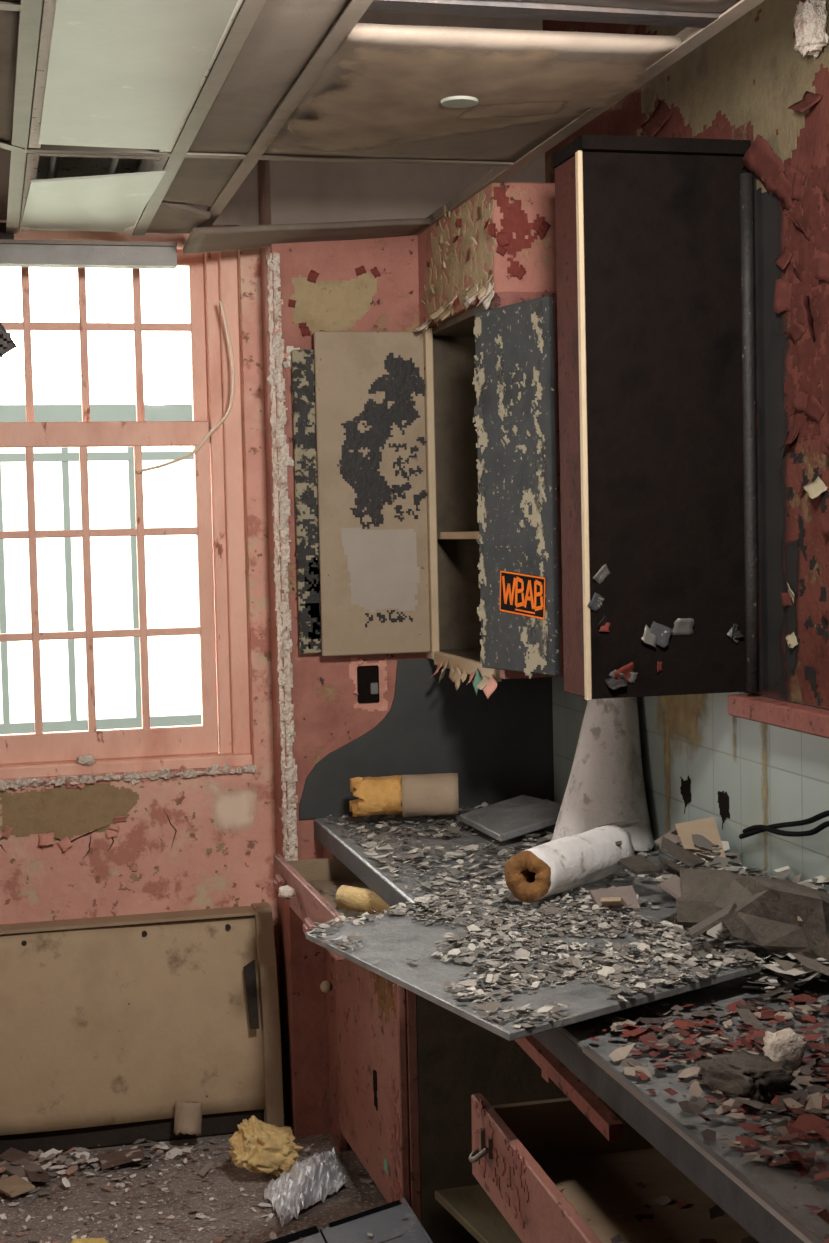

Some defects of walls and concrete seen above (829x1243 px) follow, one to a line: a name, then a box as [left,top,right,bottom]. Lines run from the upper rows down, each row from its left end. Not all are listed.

damp [275,45,657,152]
peeling [414,187,551,337]
peeling [636,0,829,535]
flaking render [266,251,381,861]
peeling [781,516,817,607]
peeling [349,657,388,712]
peeling [785,587,829,705]
peeling [0,764,256,859]